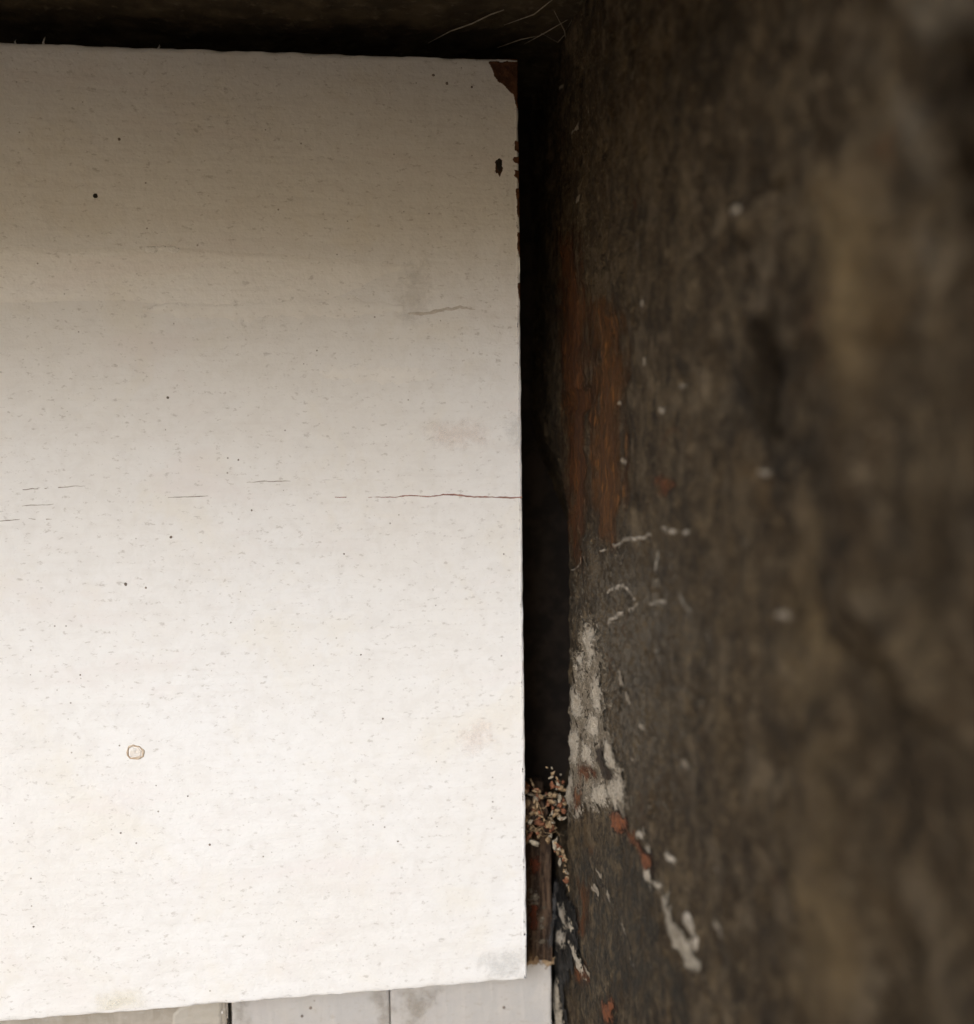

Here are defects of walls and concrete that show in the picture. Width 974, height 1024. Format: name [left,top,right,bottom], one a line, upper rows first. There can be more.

peeling [487,58,518,109]
crack [2,486,81,521]
crack [335,492,522,500]
leakage [567,522,716,1024]